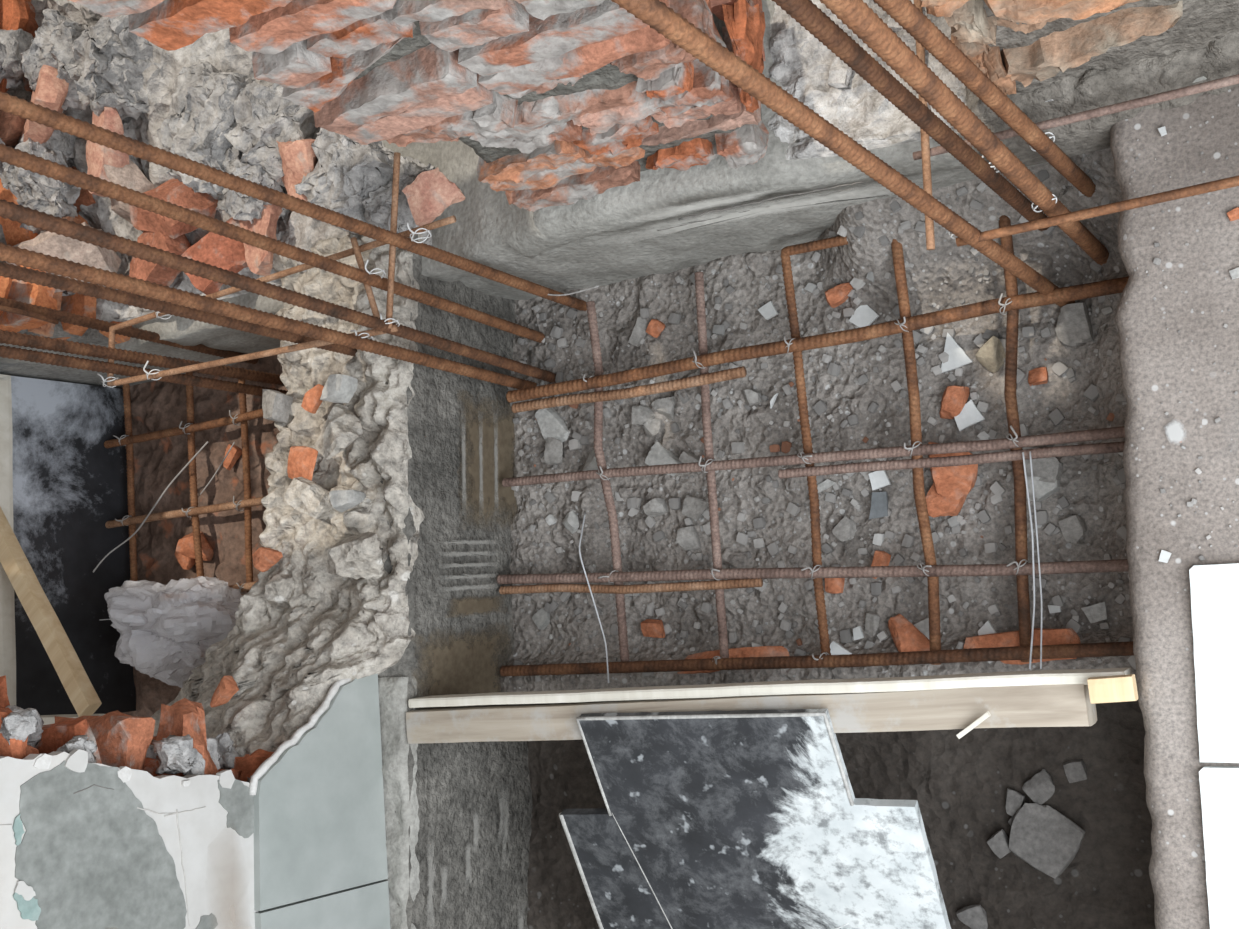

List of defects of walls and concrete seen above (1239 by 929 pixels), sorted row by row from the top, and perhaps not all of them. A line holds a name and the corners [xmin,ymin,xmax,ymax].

spalling [0,0,1183,712]
flaking render [0,675,351,929]
spalling [395,741,533,929]